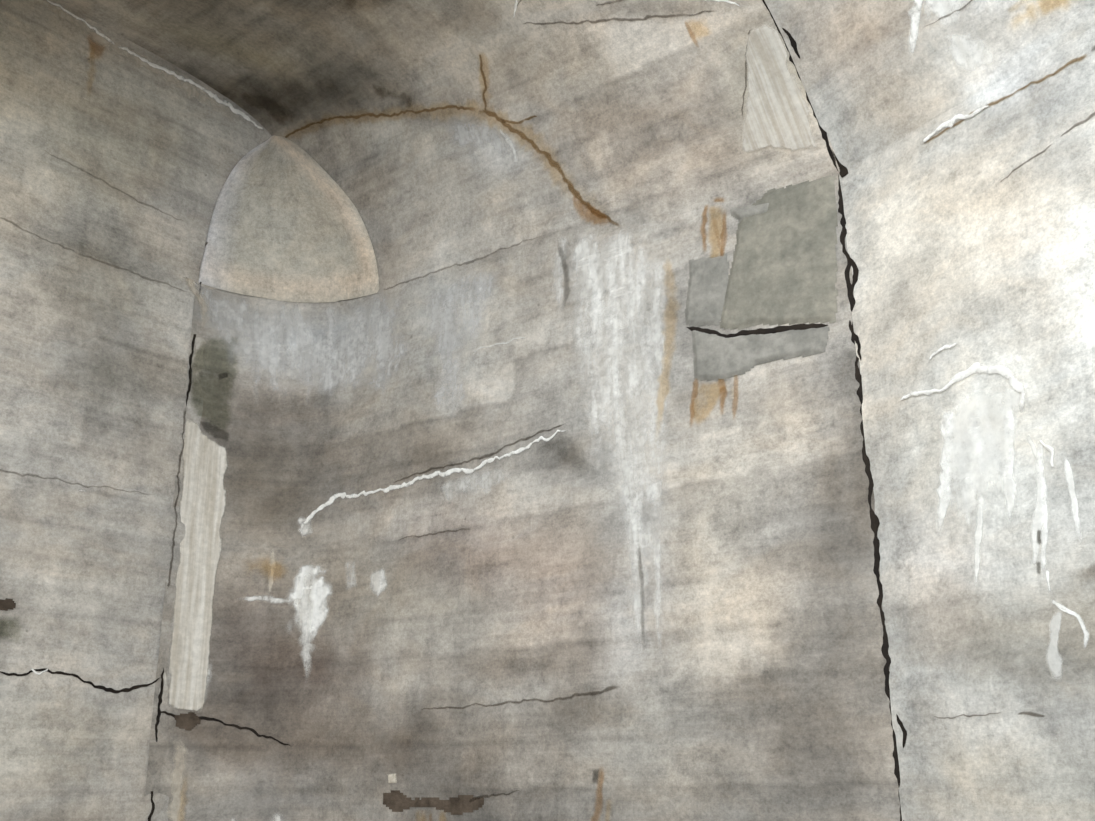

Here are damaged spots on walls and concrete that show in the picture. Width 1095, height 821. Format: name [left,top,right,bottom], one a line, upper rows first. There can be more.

water stain [47,0,263,129]
crack [186,334,196,406]
crack [705,0,907,821]
water stain [0,598,16,611]
water stain [247,566,330,661]
water stain [371,570,386,595]
crack [299,430,563,534]
water stain [937,409,984,579]
water stain [1028,437,1089,643]
crack [0,668,289,745]
crack [147,791,155,821]
spalling [383,774,484,815]